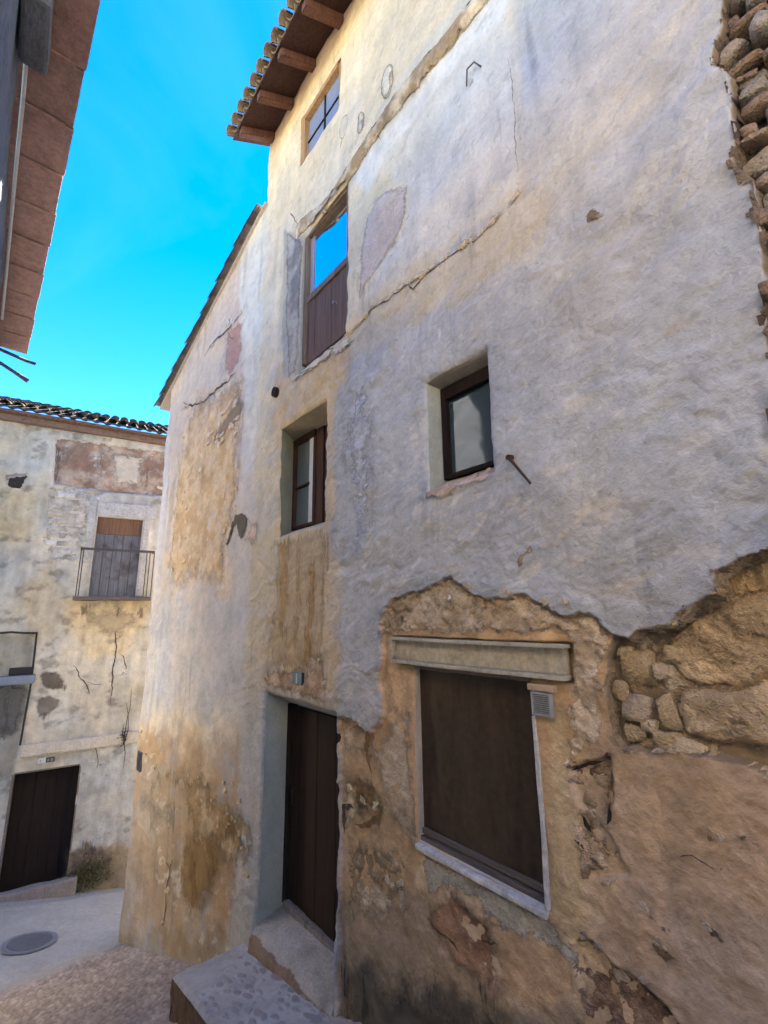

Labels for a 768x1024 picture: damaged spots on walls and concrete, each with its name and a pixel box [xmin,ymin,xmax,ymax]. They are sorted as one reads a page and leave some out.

crack [343,60,519,338]
spalling [587,209,603,223]
crack [182,374,233,416]
flaking render [168,319,242,583]
crack [74,611,127,705]
spalling [376,546,768,886]
flaking render [342,712,416,842]
leakage [181,821,235,910]
spalling [349,842,406,916]
leakage [344,961,508,1024]
flaking render [426,896,502,997]
spalling [571,927,679,1024]